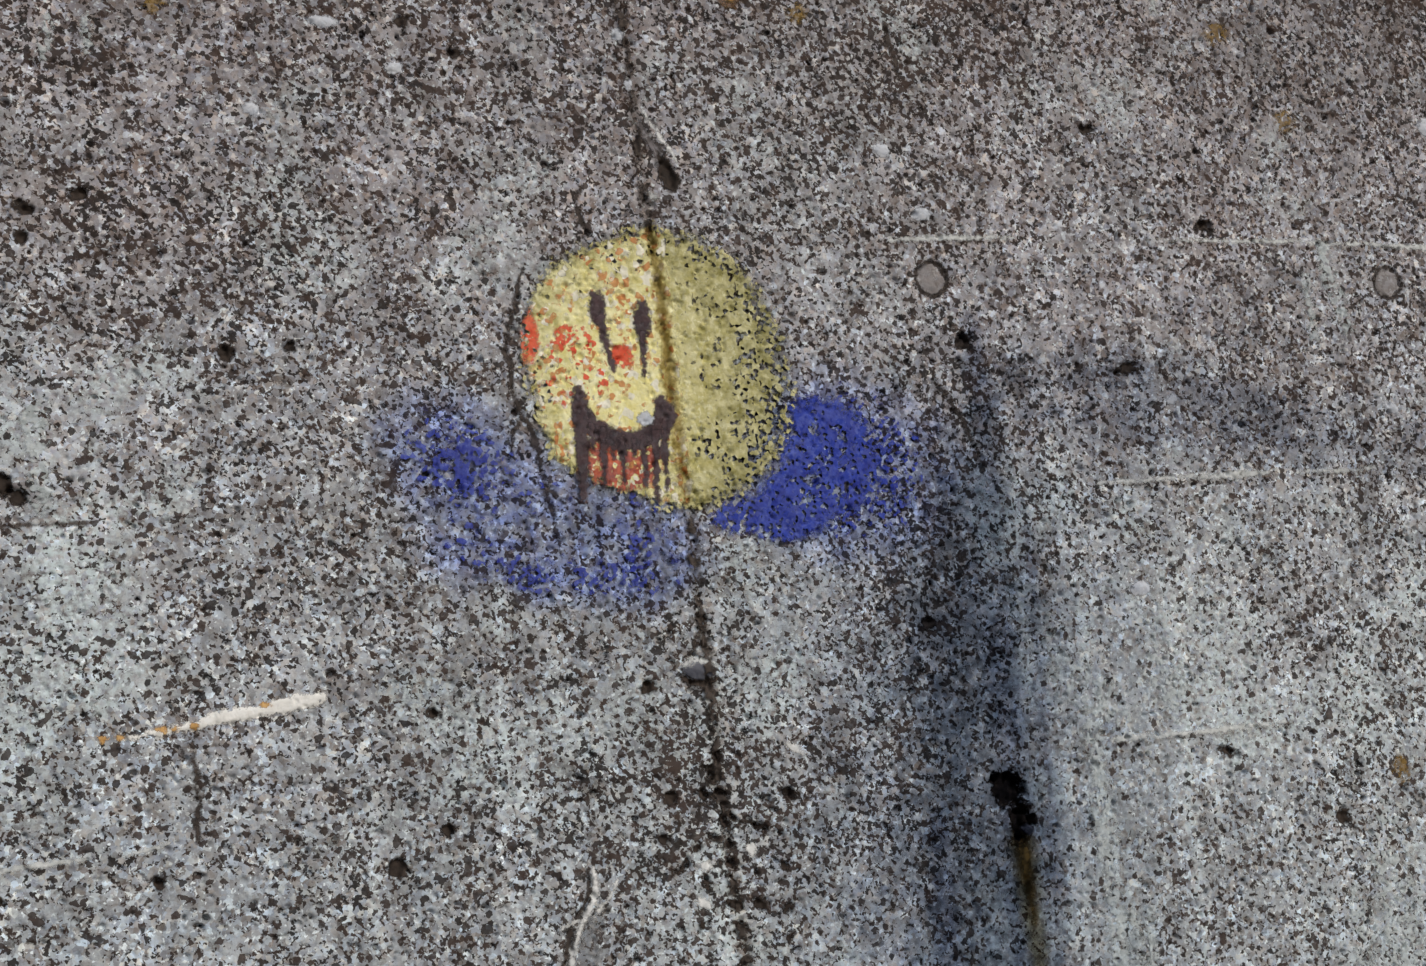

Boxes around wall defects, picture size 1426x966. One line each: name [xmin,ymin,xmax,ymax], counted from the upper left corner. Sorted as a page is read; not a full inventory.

crack [613,0,652,265]
crack [685,491,760,966]
rust [988,767,1039,926]